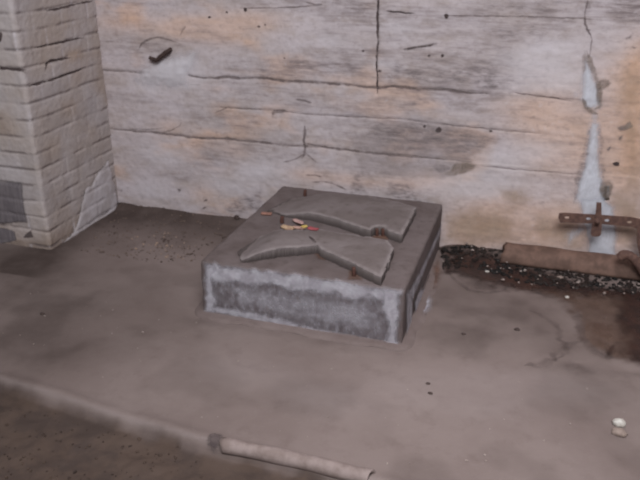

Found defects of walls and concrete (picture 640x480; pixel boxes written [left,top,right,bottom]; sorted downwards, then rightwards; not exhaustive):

crack [188,0,488,94]
damp [583,61,609,110]
crack [115,102,313,157]
crack [324,146,472,162]
damp [570,124,615,255]
corrosion [435,251,640,362]
damp [562,294,635,358]